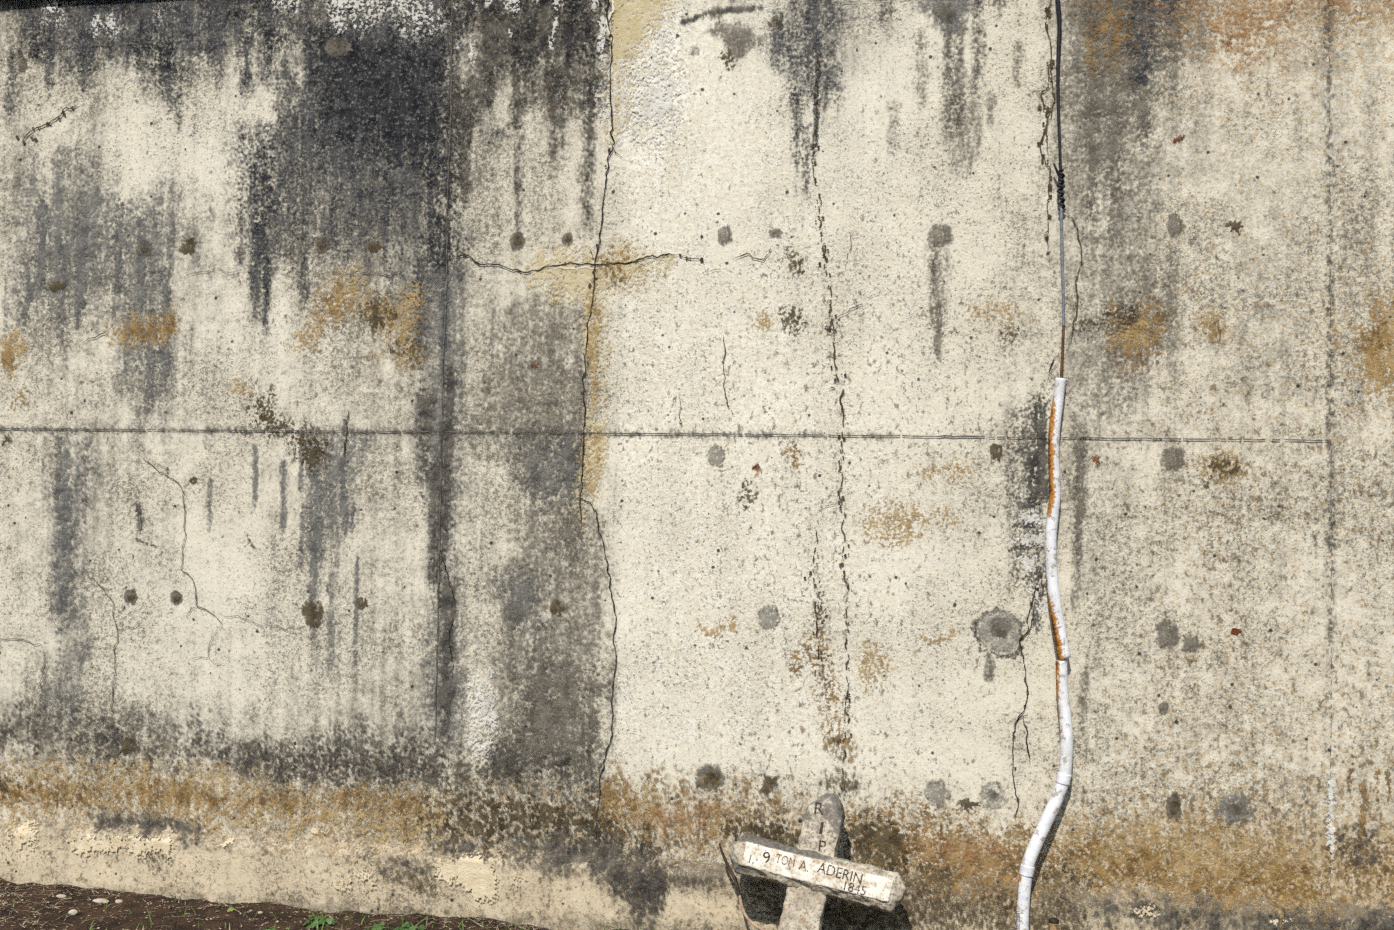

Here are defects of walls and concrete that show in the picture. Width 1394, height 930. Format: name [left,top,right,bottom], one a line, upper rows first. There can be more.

water stain [770,0,843,193]
water stain [916,0,1005,165]
corrosion [1067,0,1135,73]
corrosion [1179,0,1394,68]
water stain [929,244,949,360]
water stain [0,0,725,930]
crack [454,0,771,840]
crack [804,56,880,799]
crack [1012,581,1039,820]
water stain [736,879,786,930]
water stain [822,877,1394,930]
water stain [1325,774,1337,874]